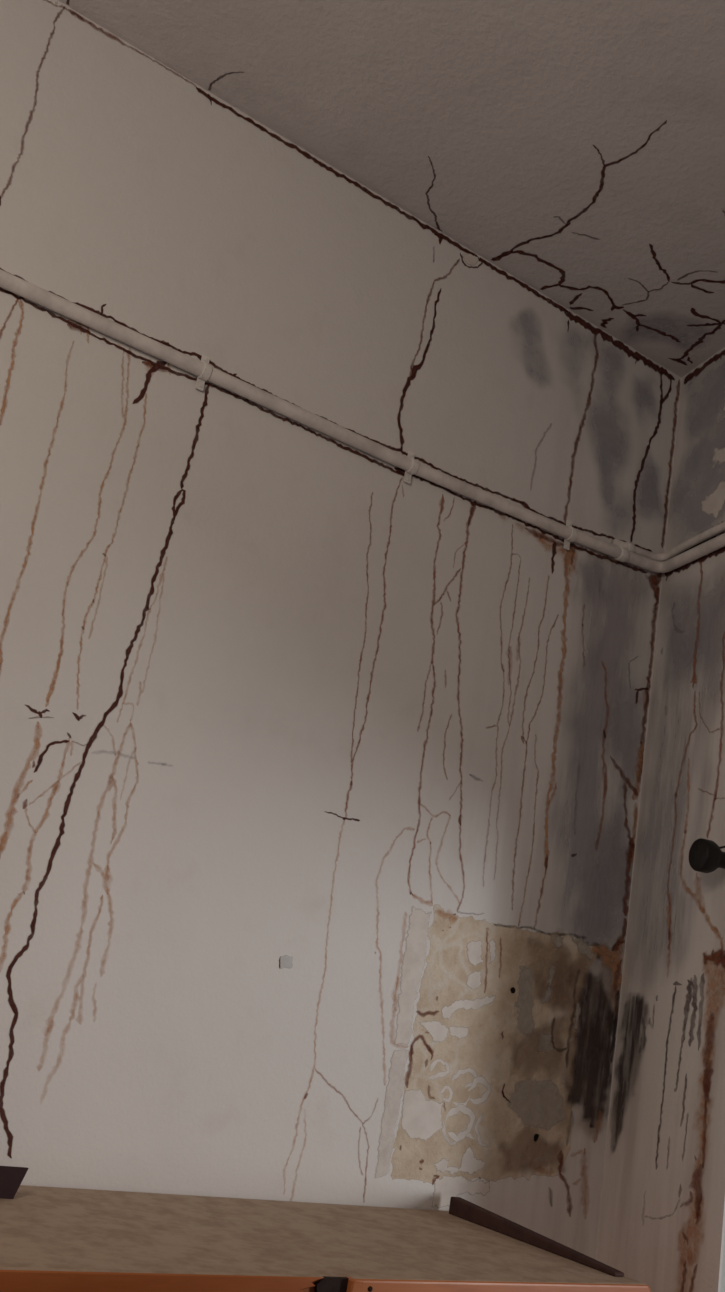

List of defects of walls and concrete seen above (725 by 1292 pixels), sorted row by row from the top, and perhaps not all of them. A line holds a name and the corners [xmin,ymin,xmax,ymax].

crack [0,383,209,1158]
crack [0,0,725,548]
rust [0,268,725,988]
water stain [561,566,685,943]
water stain [674,356,725,533]
peeling [375,904,598,1208]
water stain [551,974,705,1169]
rust [679,927,725,1292]